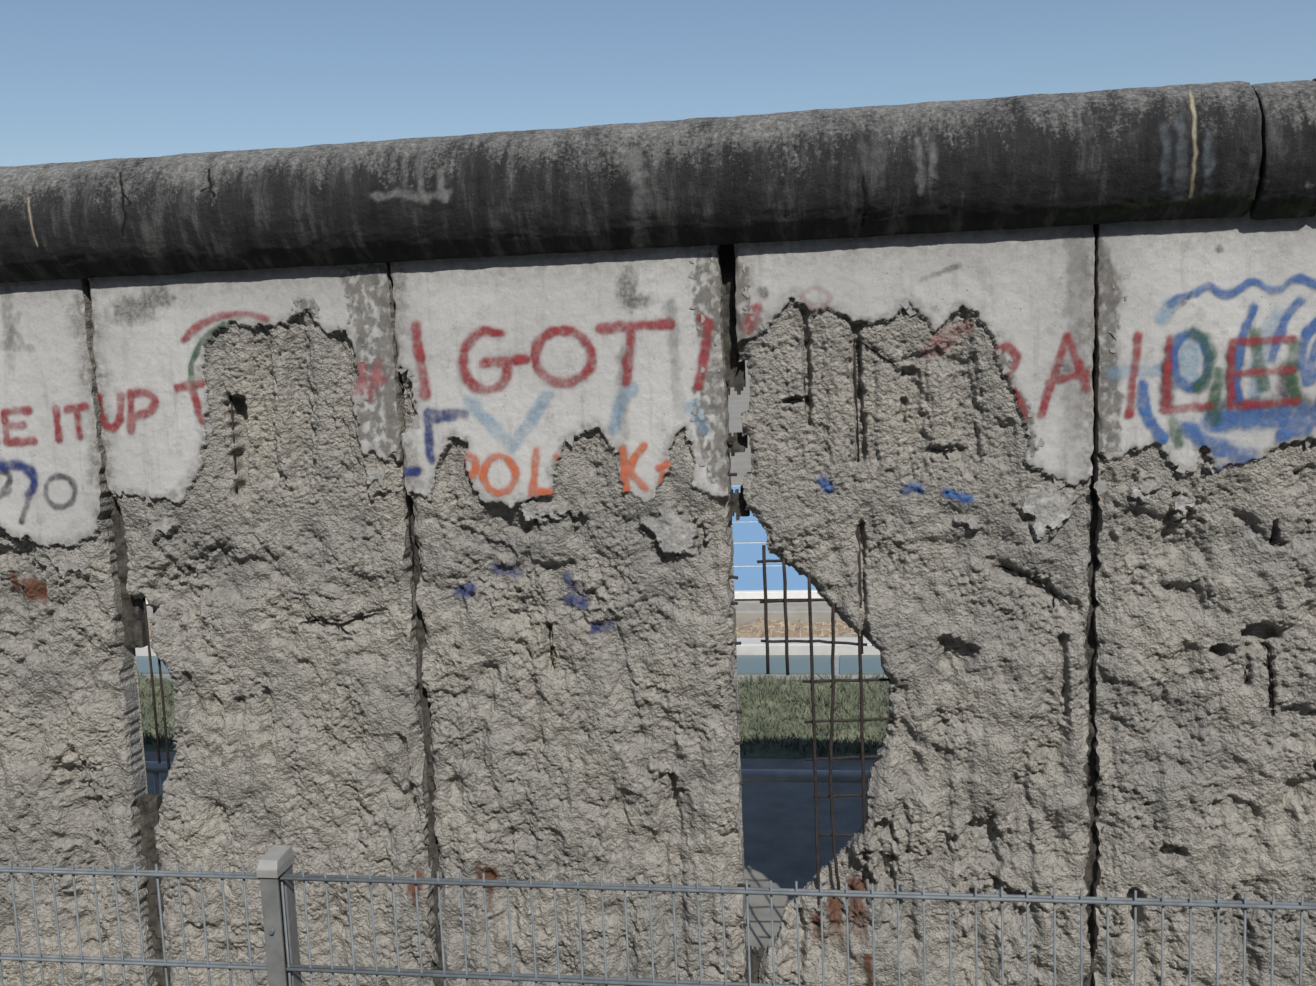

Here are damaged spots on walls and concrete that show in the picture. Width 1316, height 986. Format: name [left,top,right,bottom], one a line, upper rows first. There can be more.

crack [992,563,1076,611]
crack [300,611,387,635]
spalling [0,250,1316,986]